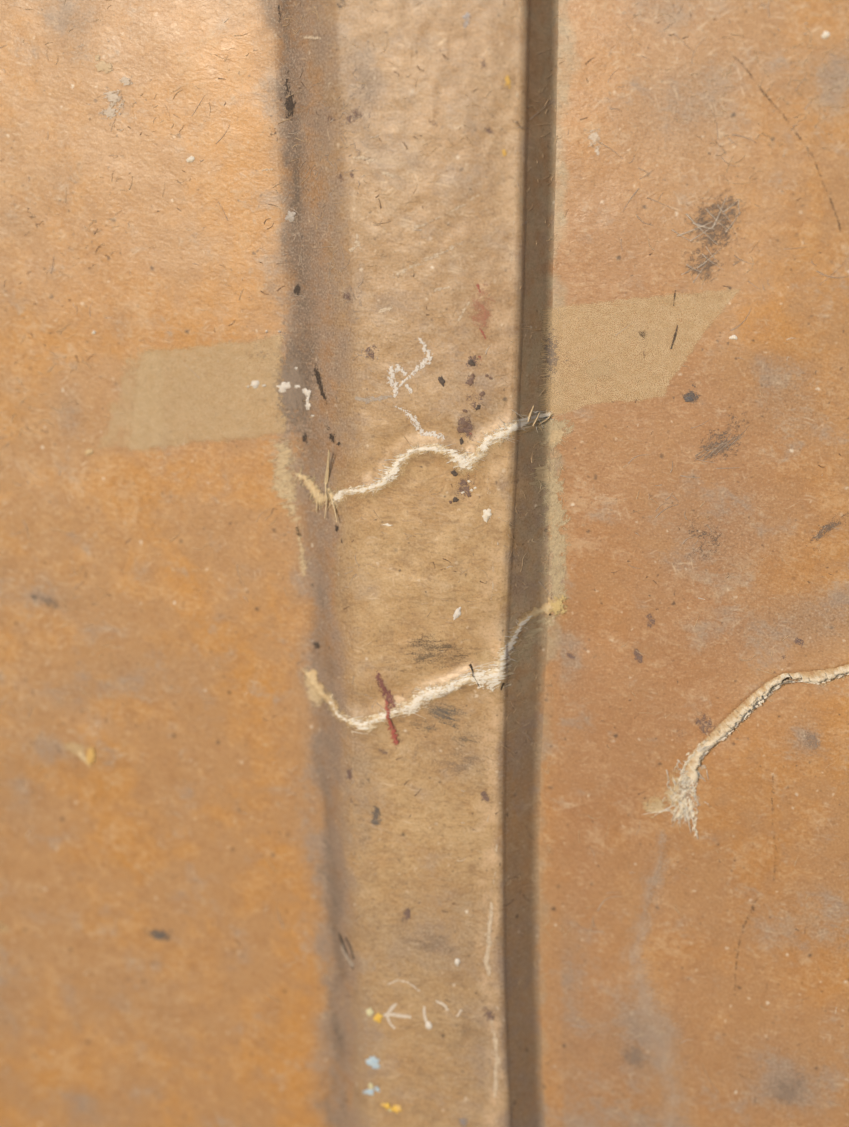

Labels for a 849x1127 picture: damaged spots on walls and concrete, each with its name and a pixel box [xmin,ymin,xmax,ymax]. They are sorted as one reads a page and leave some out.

crack [291,406,554,522]
crack [299,595,568,749]
crack [639,664,849,839]